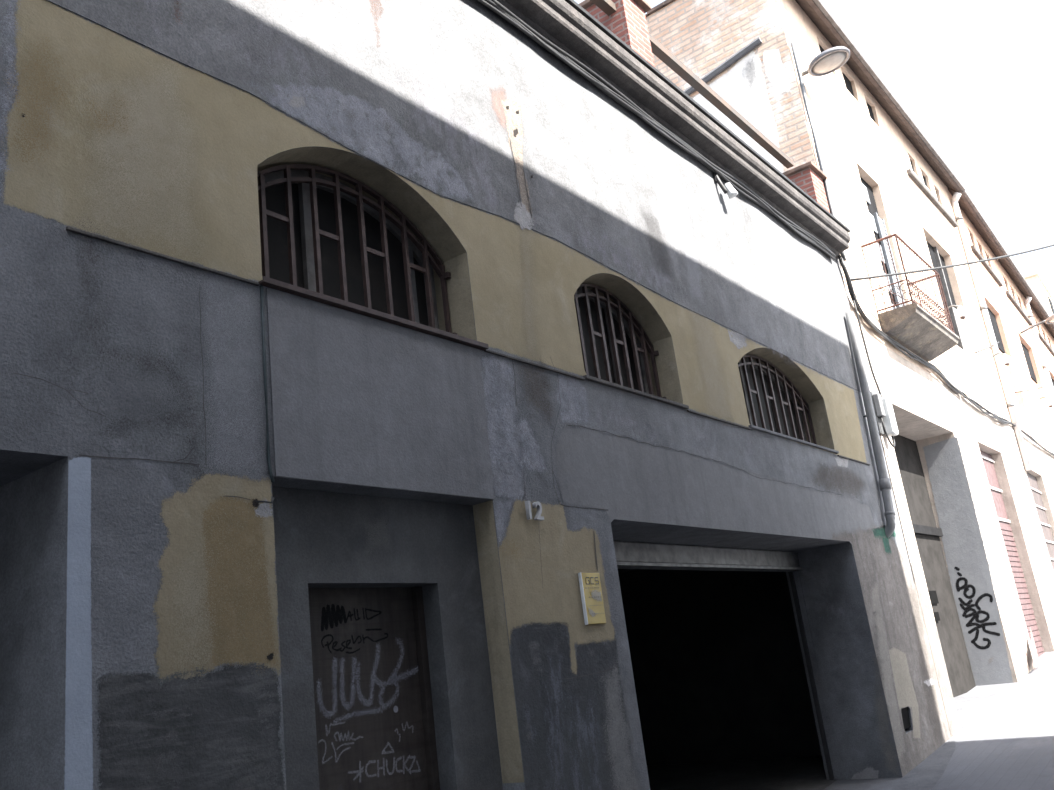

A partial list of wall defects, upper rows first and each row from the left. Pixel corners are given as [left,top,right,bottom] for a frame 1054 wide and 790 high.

peeling [153,473,285,681]
peeling [481,354,615,675]
crack [550,357,841,510]